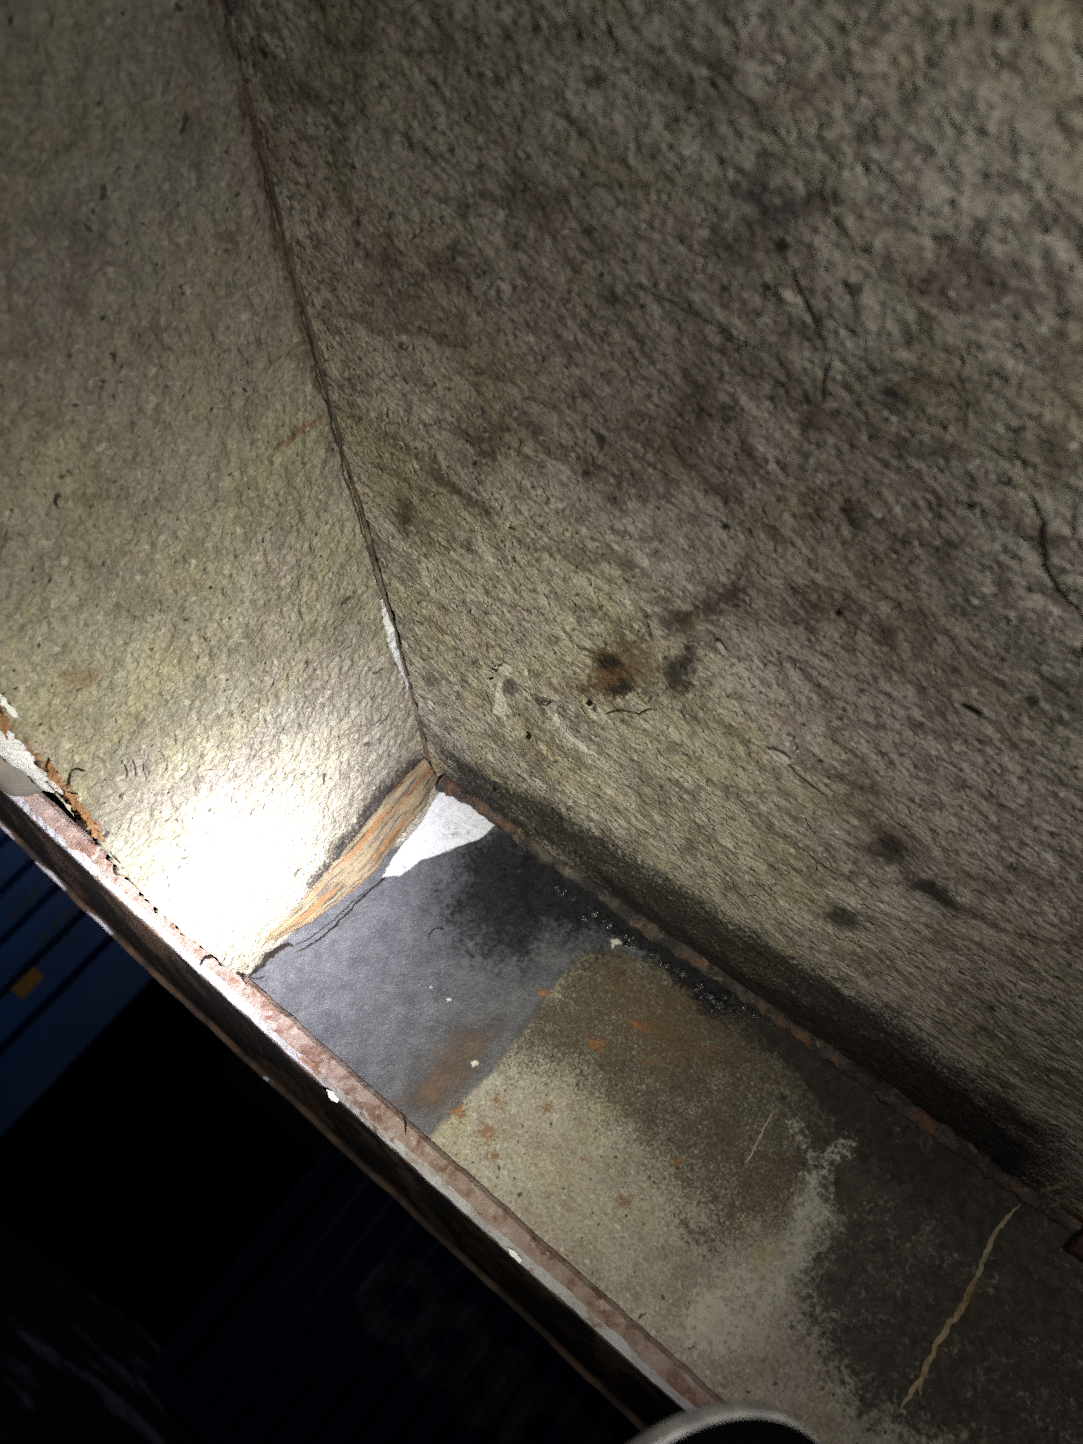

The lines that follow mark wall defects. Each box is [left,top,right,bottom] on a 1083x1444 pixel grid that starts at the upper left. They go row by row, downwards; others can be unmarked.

spalling [0,694,106,843]
peeling [36,862,66,890]
damp [247,825,1025,1278]
rust [474,1122,505,1160]
damp [895,1204,1022,1415]